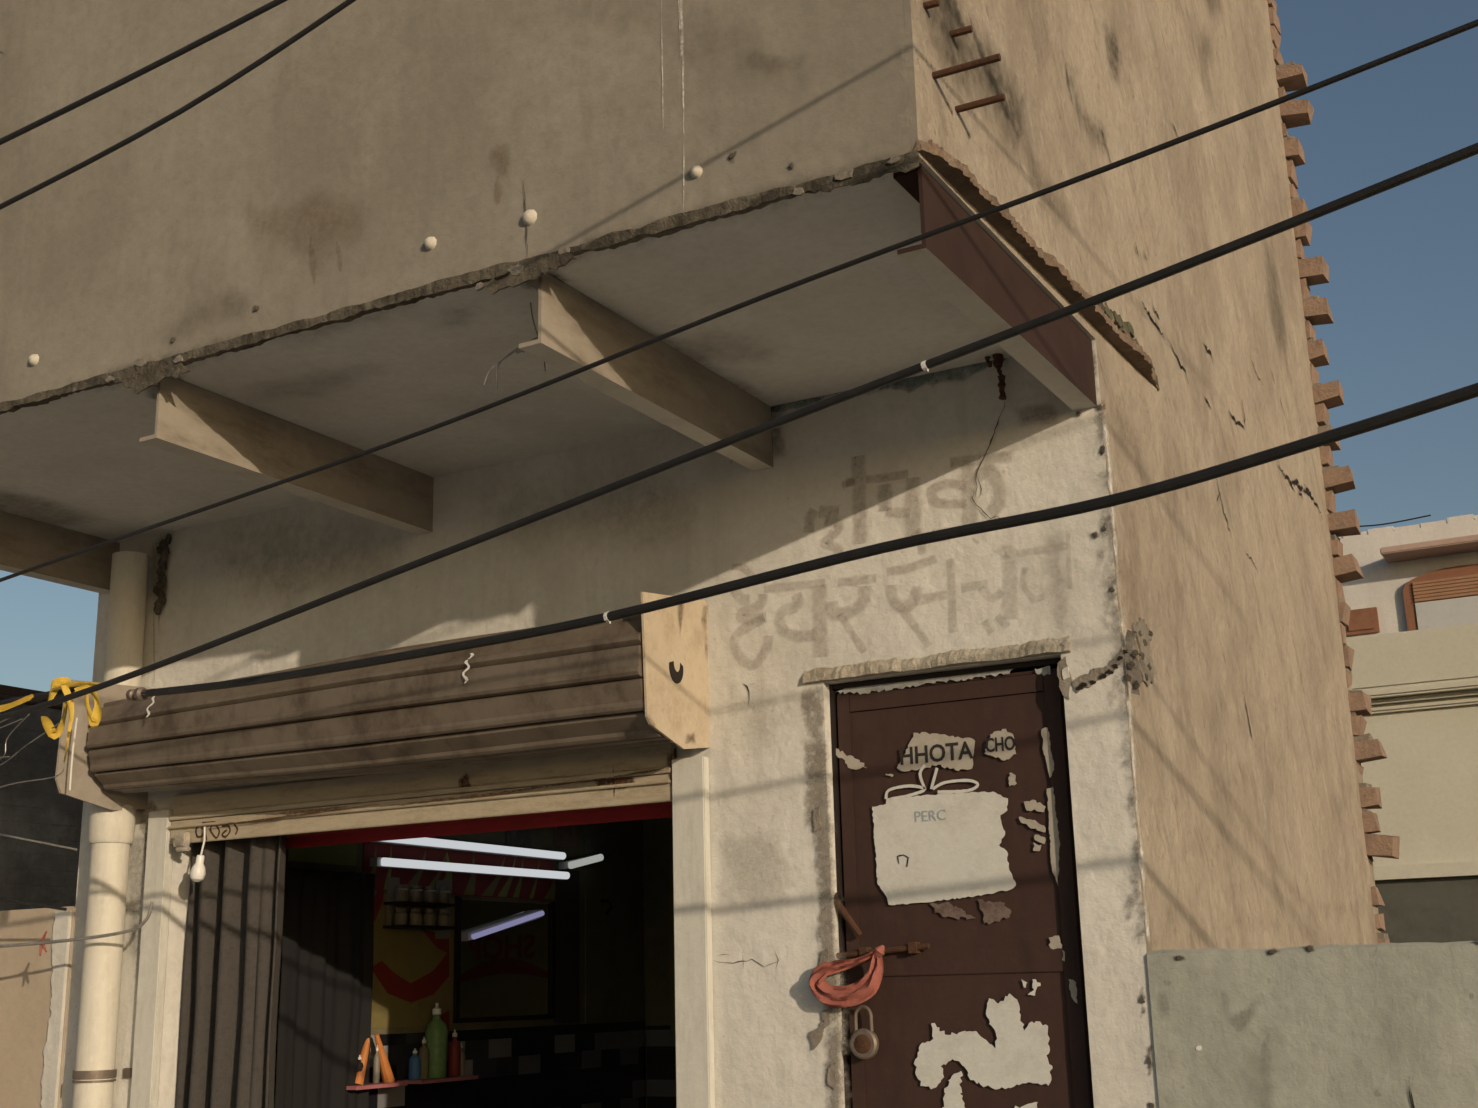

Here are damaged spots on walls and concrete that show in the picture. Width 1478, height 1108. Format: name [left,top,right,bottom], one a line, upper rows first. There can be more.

spalling [793,139,944,196]
spalling [474,246,576,294]
spalling [105,338,190,394]
crack [1142,302,1285,429]
crack [1277,461,1323,519]
peeling [1057,576,1157,699]